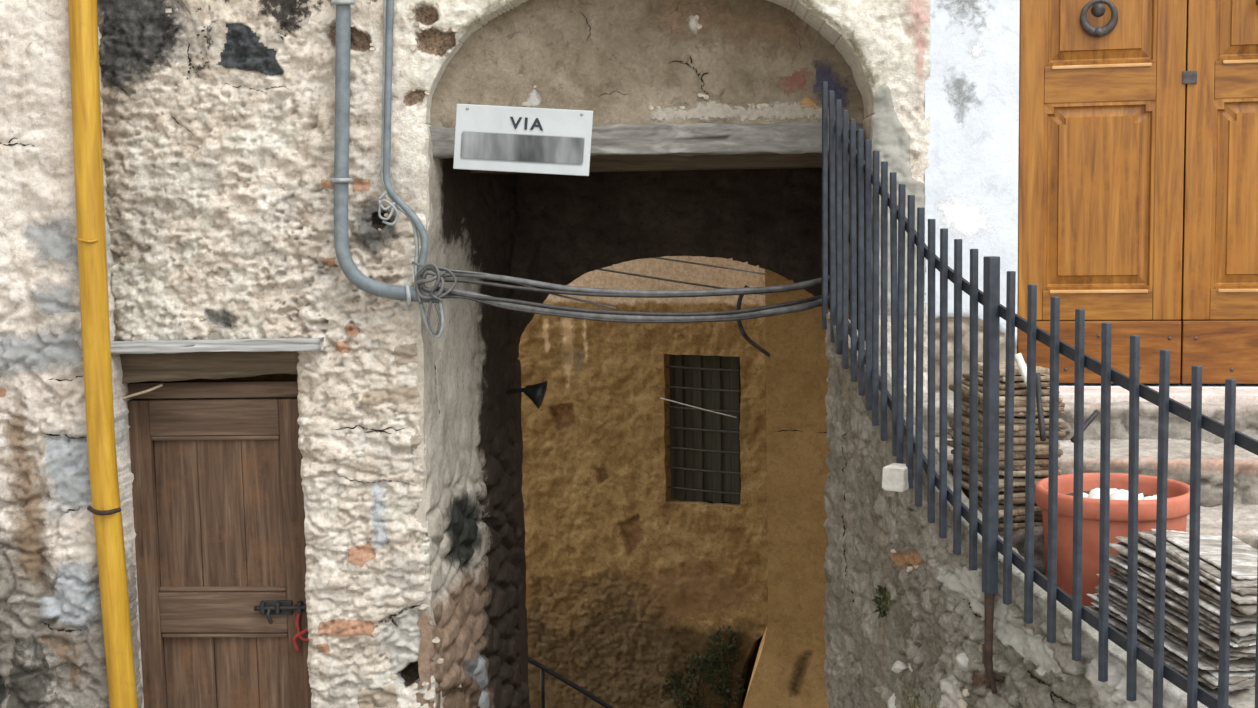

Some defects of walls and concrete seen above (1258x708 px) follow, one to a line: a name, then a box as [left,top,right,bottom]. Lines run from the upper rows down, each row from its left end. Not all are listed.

damp [97,0,332,102]
spalling [407,3,459,57]
crack [668,3,713,100]
damp [938,0,979,26]
crack [336,425,404,434]
damp [0,636,53,708]